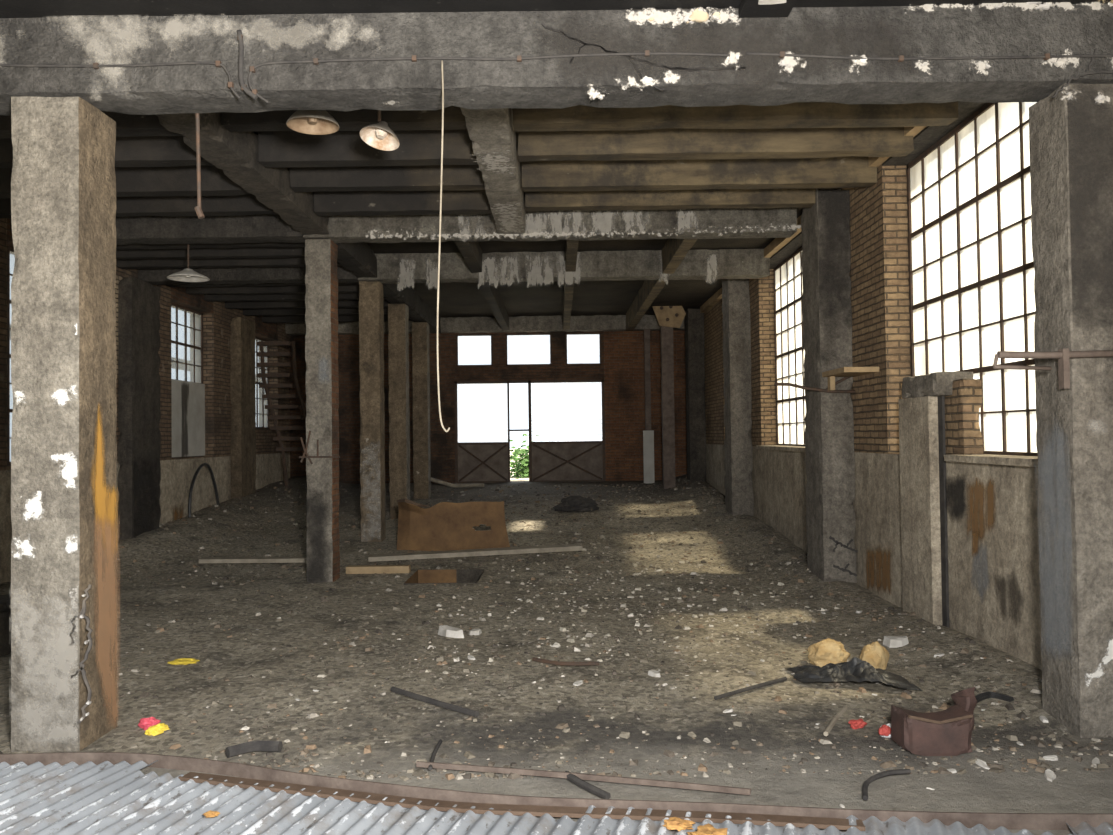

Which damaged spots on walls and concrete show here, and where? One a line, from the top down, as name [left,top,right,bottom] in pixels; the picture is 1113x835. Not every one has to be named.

spalling [626,7,741,28]
spalling [723,51,741,70]
spalling [778,51,805,73]
spalling [849,55,867,75]
spalling [972,60,991,75]
spalling [1042,48,1079,68]
peeling [366,202,801,241]
peeling [397,259,438,291]
peeling [478,253,581,289]
rust [967,479,994,555]
rust [95,409,118,722]
crack [829,535,858,577]